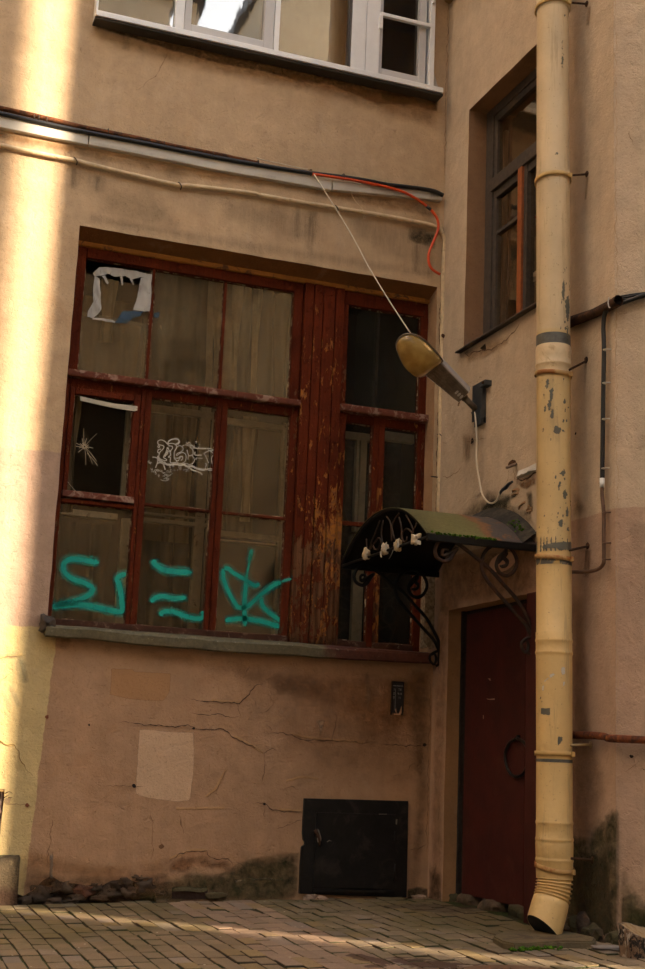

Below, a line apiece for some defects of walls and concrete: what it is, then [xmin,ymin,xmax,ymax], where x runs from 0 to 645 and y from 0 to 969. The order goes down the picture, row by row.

crack [0,739,32,775]
crack [120,668,431,850]
leakage [567,814,618,936]